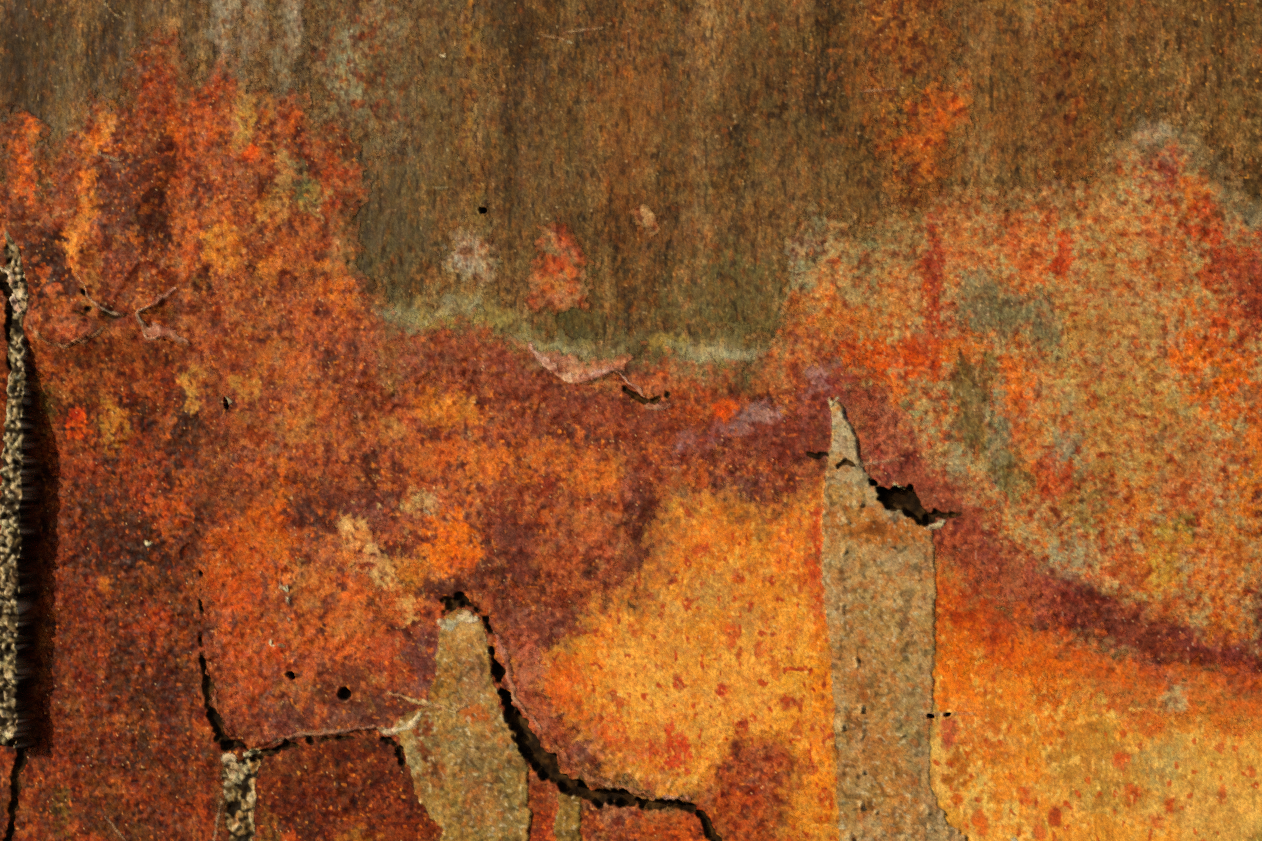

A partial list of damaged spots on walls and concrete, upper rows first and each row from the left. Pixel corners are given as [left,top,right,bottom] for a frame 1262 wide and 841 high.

peeling [0,231,103,748]
rust [0,24,396,841]
peeling [221,749,261,841]
crack [197,570,405,768]
peeling [378,609,531,841]
rust [523,215,601,316]
crack [440,592,722,841]
peeling [528,343,670,410]
rust [629,203,661,238]
rust [163,253,1262,841]
peeling [821,397,966,841]
rust [775,0,1262,639]